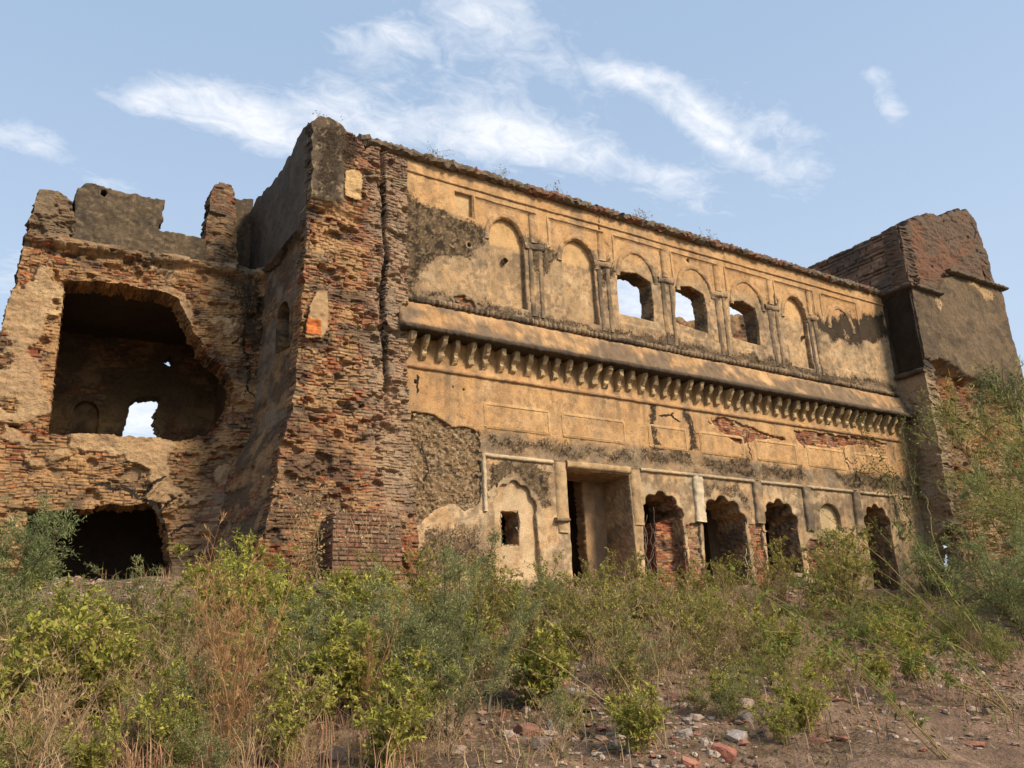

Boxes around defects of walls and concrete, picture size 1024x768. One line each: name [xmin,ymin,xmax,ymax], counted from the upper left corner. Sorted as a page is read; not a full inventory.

flaking render [305,290,330,338]
crack [375,173,391,394]
damp [477,298,897,393]
damp [806,289,925,374]
flaking render [409,412,484,525]
damp [485,404,807,513]
flaking render [708,417,783,444]
flaking render [794,429,884,448]